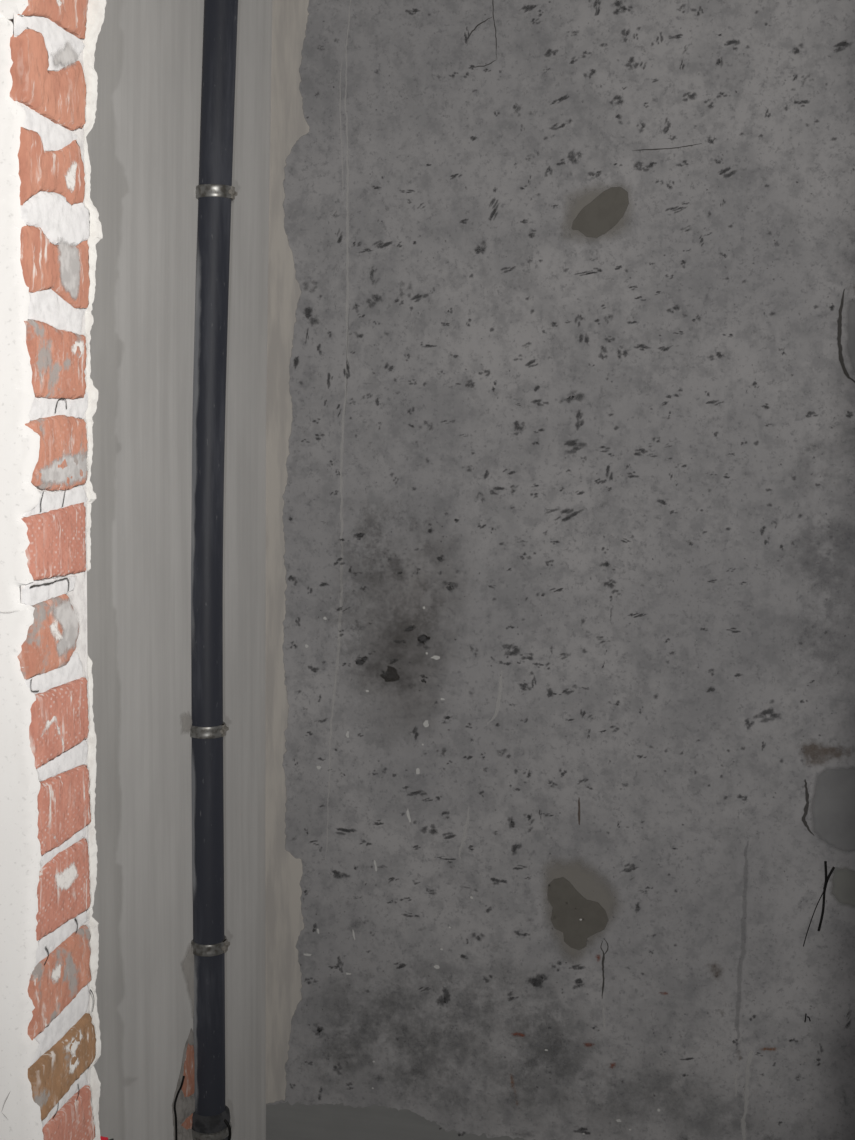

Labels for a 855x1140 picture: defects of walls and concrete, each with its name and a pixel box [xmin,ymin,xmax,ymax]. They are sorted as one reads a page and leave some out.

crack [837,289,855,383]
spalling [500,646,589,696]
crack [802,779,814,835]